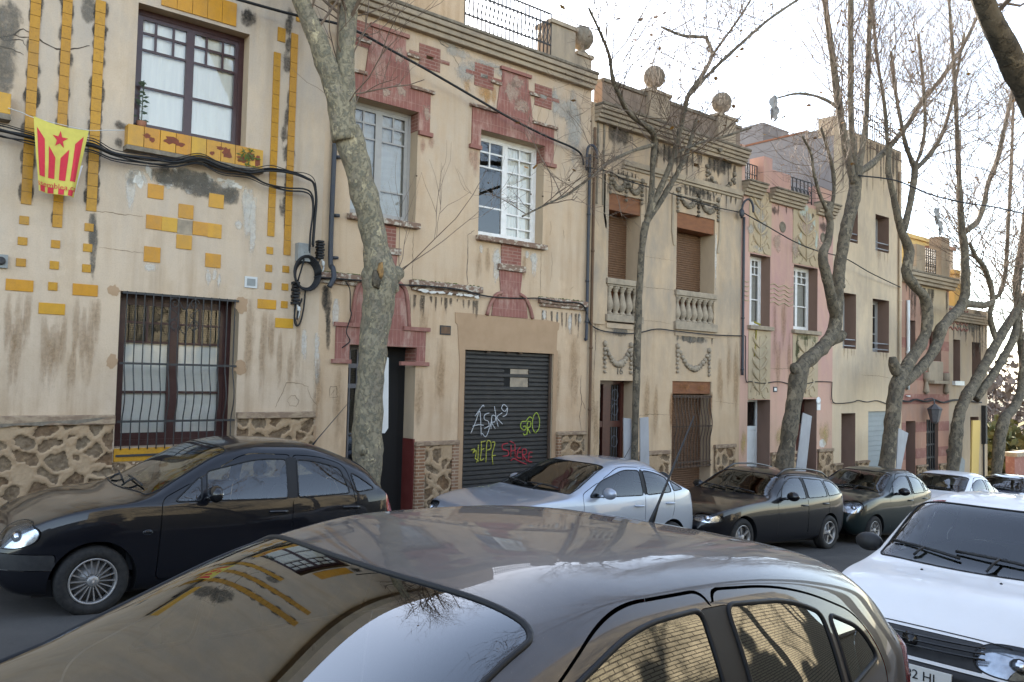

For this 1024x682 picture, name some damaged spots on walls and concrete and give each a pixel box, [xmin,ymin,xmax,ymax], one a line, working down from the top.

leakage [0,0,43,105]
leakage [58,0,108,75]
leakage [126,168,256,248]
peeling [419,289,479,299]